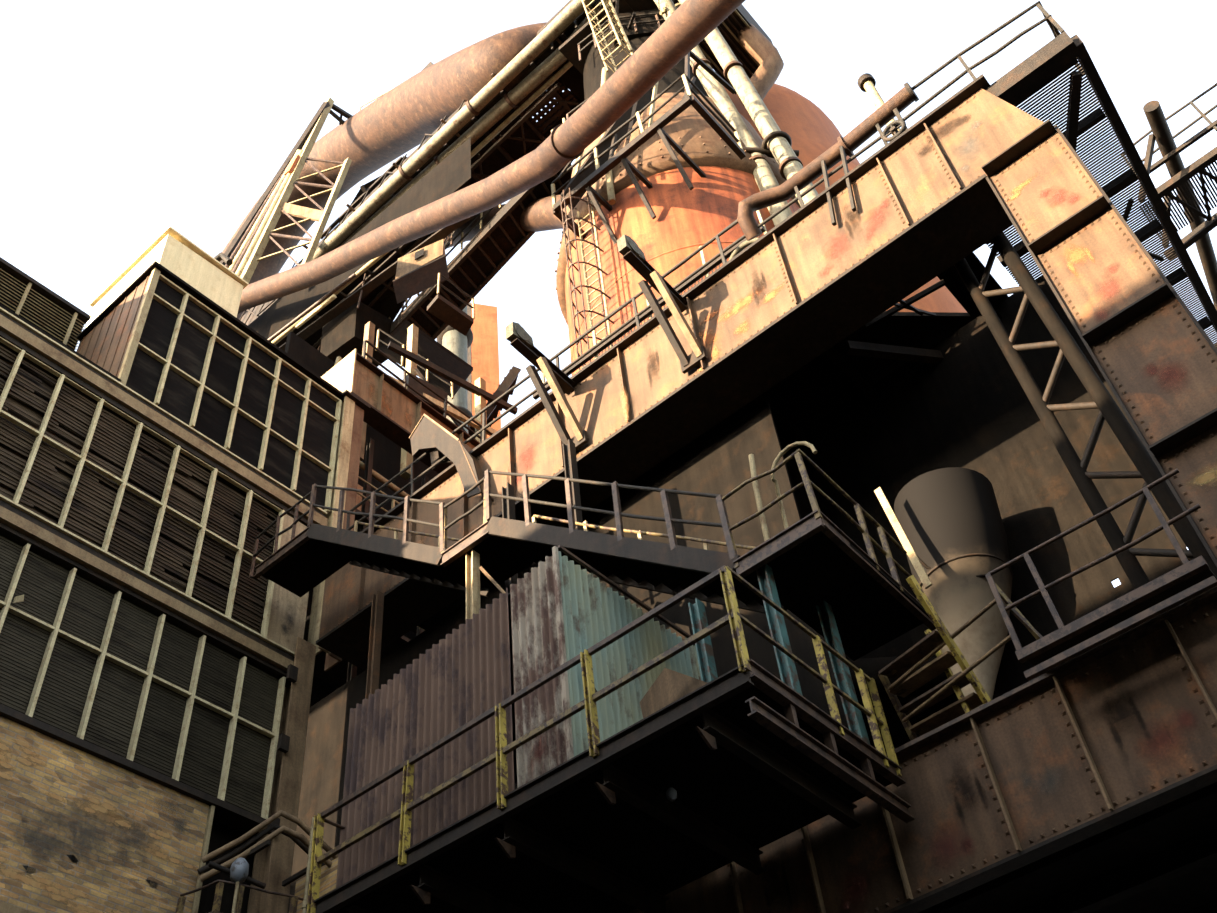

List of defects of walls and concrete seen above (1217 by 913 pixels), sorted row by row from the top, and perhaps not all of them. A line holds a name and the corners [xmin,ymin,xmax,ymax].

rust [698,289,778,371]